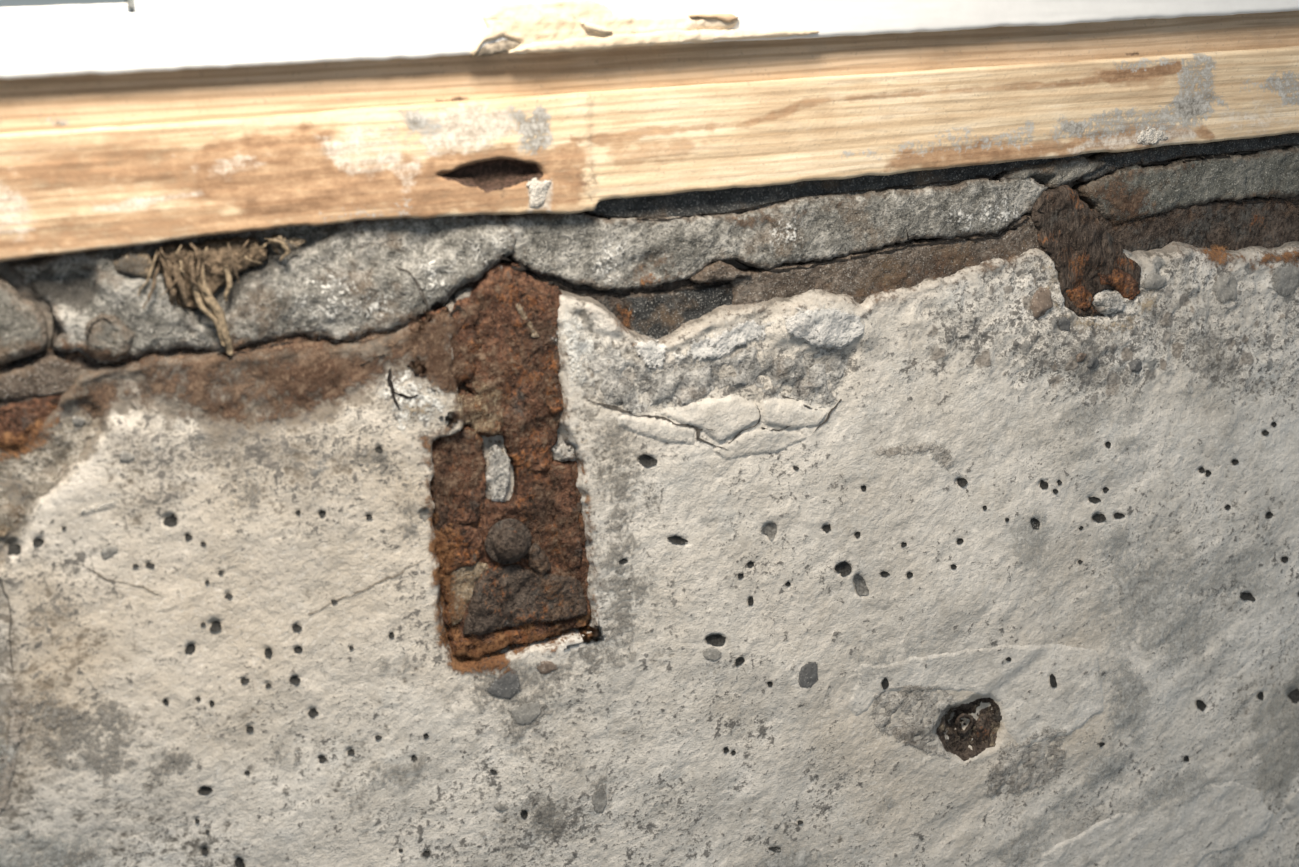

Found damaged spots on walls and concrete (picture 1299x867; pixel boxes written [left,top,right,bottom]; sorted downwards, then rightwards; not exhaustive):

rust [0,406,60,461]
crack [589,396,842,450]
rust [27,284,595,675]